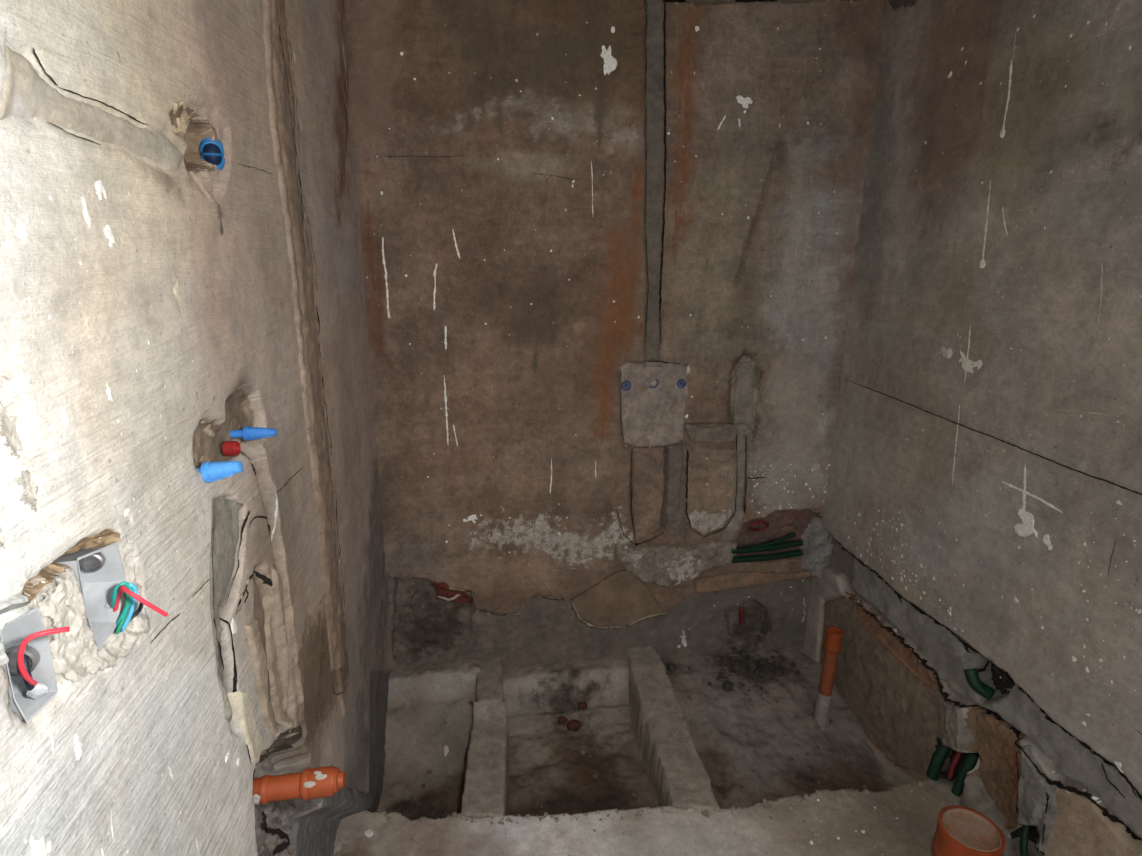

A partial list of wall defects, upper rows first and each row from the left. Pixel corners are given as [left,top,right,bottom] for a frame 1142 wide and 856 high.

crack [33,47,148,125]
spalling [731,507,821,565]
spalling [392,575,812,669]
spalling [253,725,302,778]
spalling [820,595,1045,856]
crack [837,541,1142,847]